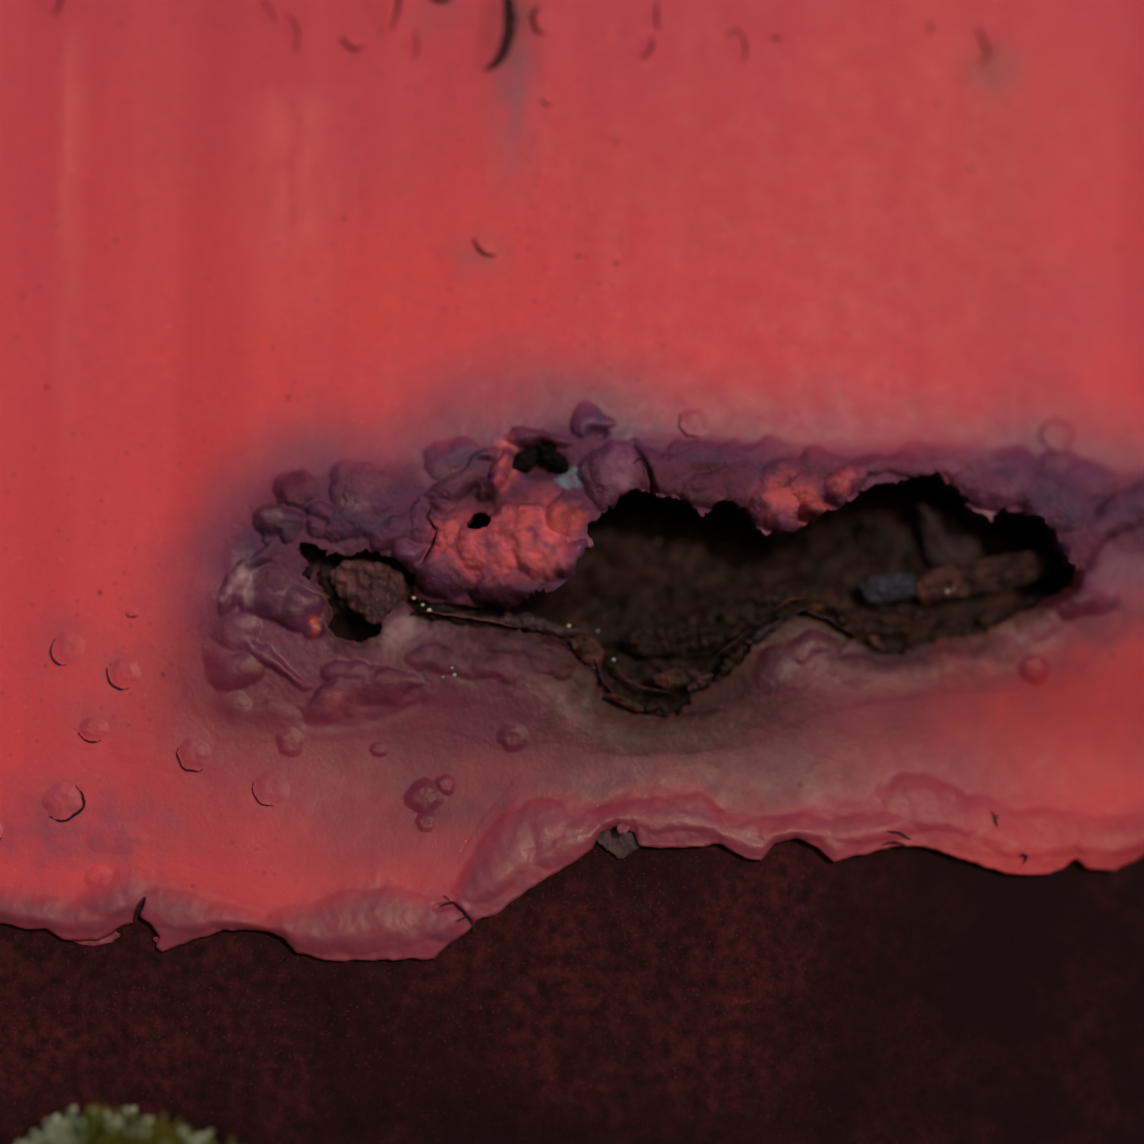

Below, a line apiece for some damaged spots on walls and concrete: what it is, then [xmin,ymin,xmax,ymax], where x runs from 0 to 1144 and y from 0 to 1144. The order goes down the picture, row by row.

peeling [475,0,517,72]
spalling [301,475,1071,715]
corrosion [450,611,607,680]
corrosion [643,624,778,717]
peeling [0,747,1144,961]